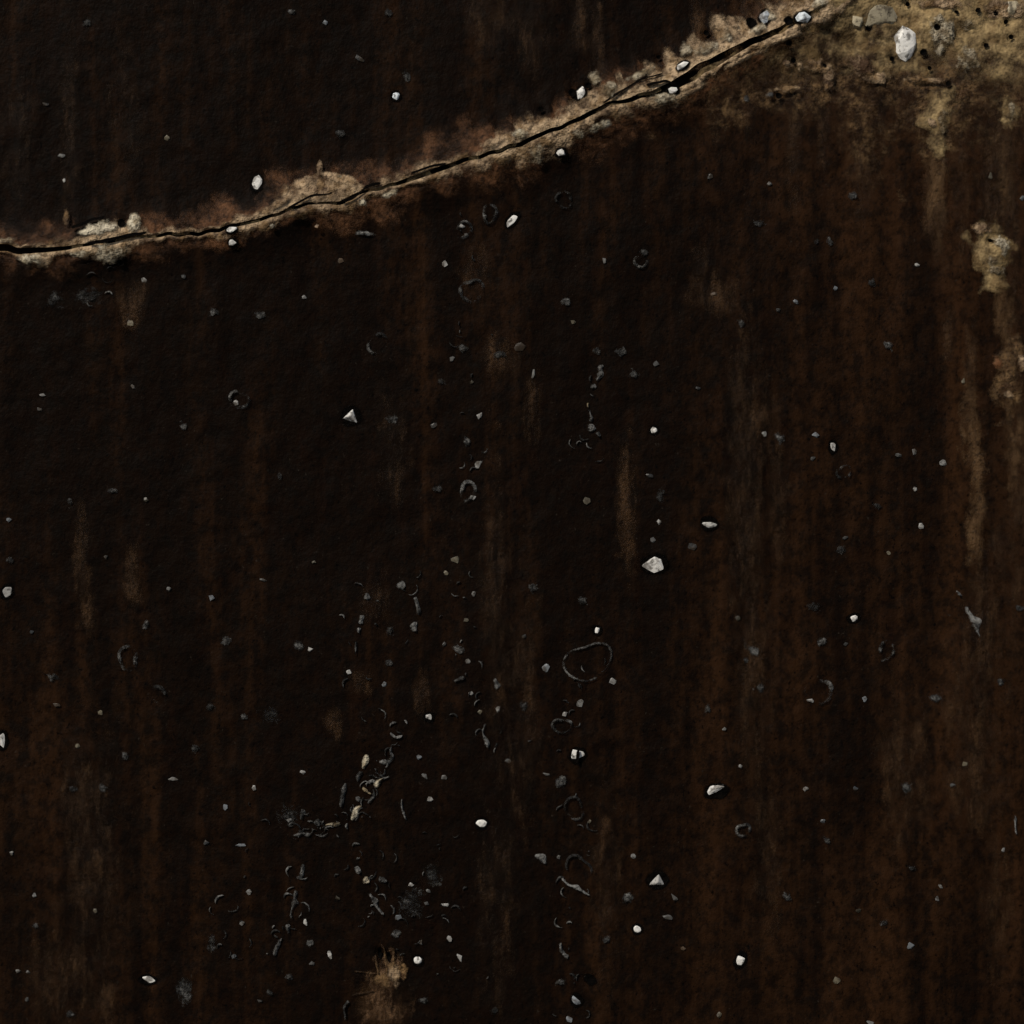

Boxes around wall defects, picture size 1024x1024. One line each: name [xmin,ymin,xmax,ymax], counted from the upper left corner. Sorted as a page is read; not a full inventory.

peeling [573,85,587,102]
peeling [666,85,680,95]
peeling [675,60,691,72]
spalling [710,0,1024,159]
crack [0,0,856,271]
spalling [963,222,1011,291]